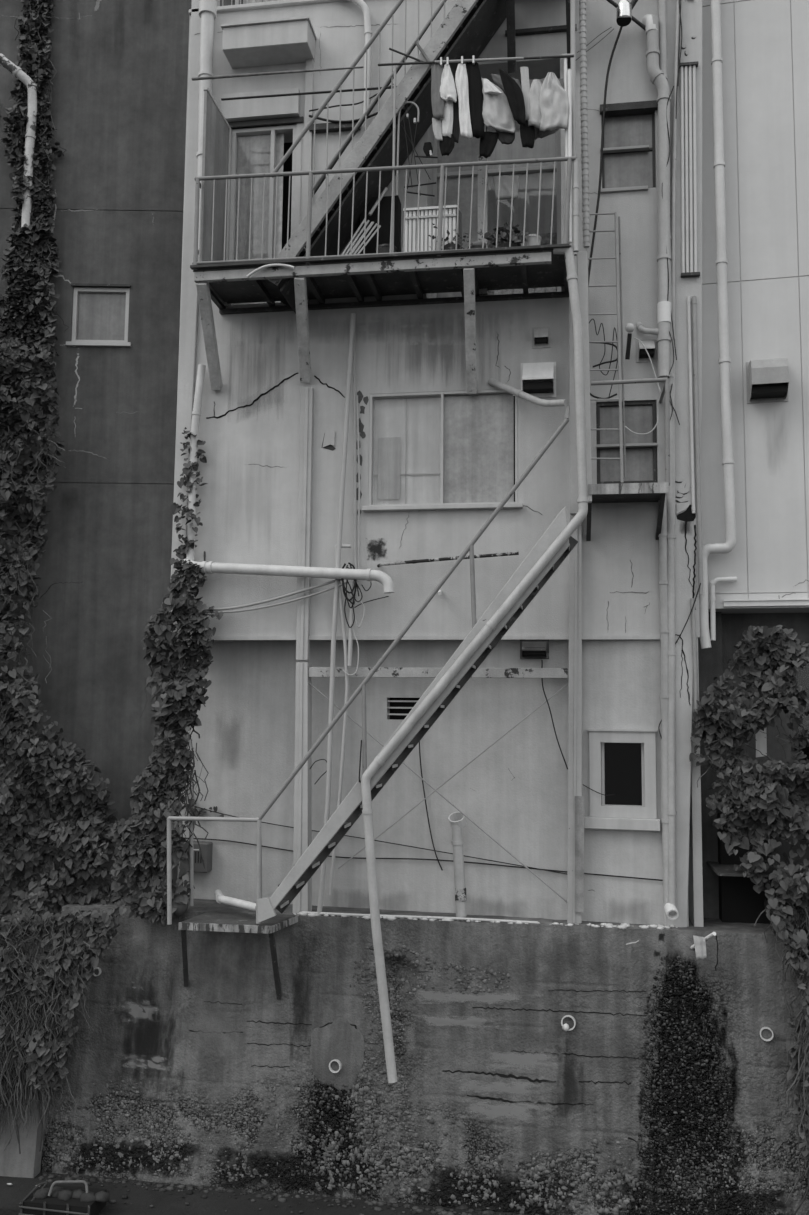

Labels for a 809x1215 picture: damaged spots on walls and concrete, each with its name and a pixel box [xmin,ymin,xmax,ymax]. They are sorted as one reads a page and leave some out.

crack [51,189,98,236]
crack [60,344,106,459]
crack [206,373,345,419]
water stain [638,934,746,1208]